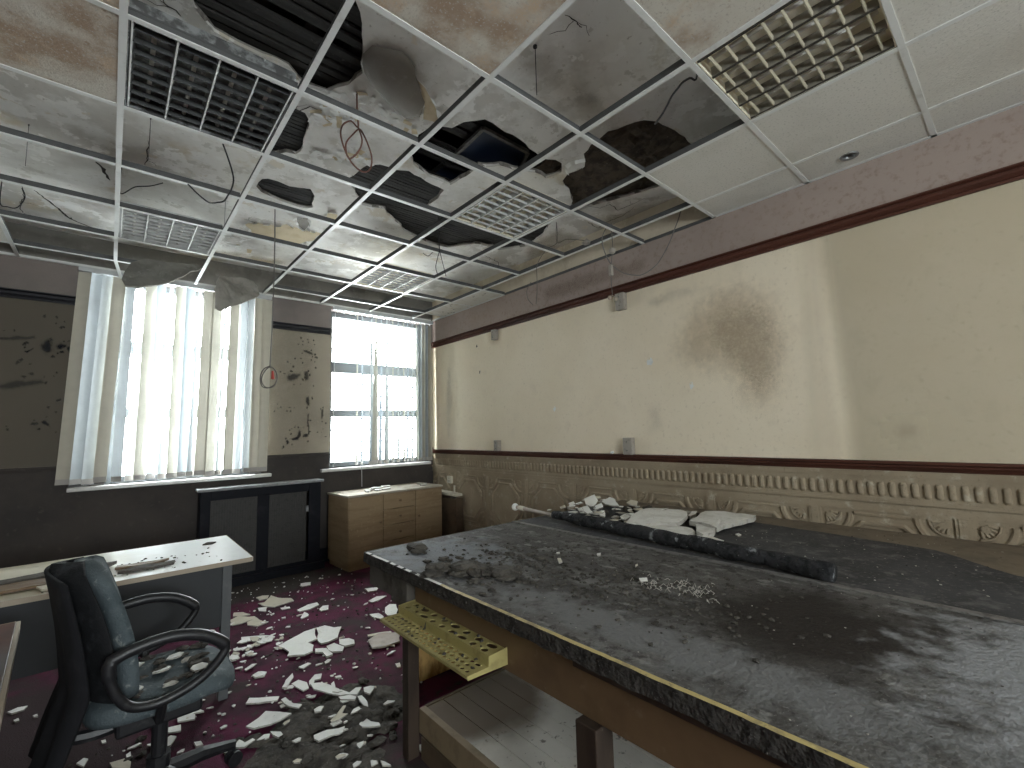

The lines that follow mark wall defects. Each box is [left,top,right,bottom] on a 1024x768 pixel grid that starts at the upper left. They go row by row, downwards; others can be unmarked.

spalling [194,0,690,253]